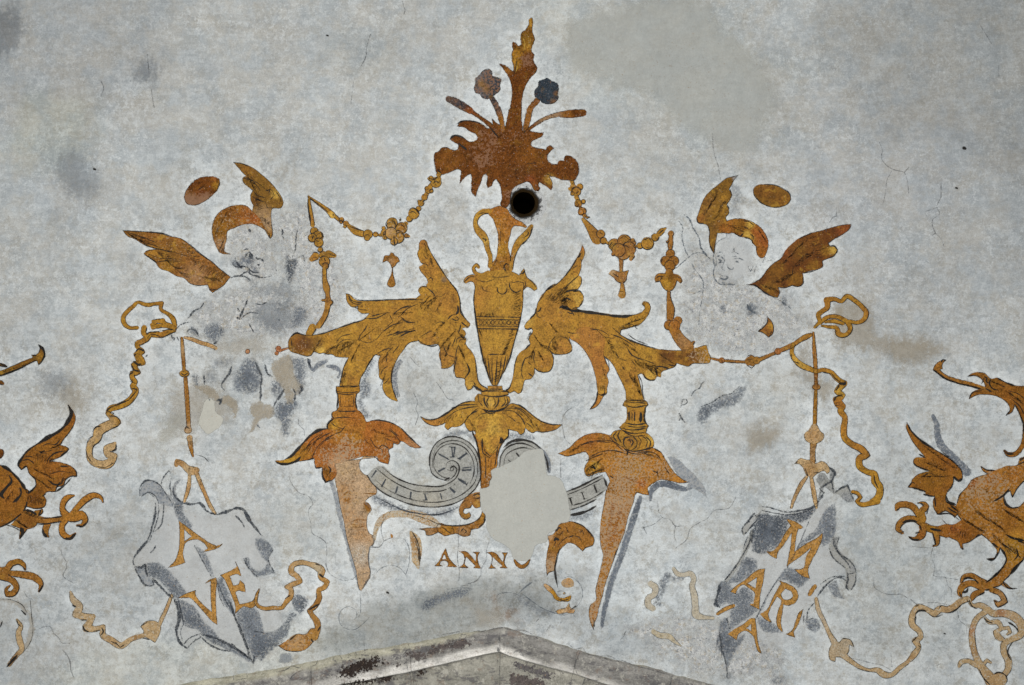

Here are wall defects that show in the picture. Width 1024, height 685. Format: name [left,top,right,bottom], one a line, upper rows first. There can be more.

peeling [197,386,274,432]